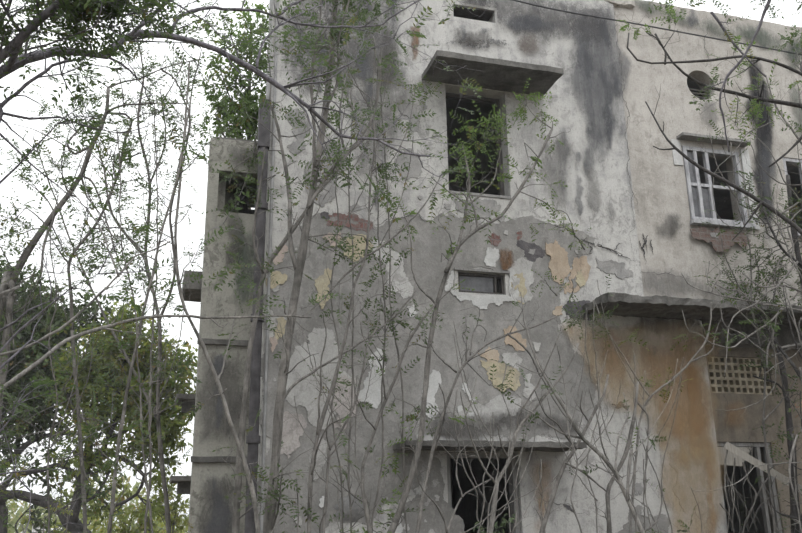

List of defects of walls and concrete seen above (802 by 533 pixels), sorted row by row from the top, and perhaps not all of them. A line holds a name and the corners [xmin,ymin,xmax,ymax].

water stain [446,26,507,48]
water stain [465,0,630,215]
crack [584,12,695,280]
water stain [747,59,776,231]
flaking render [257,140,633,533]
water stain [436,412,577,437]